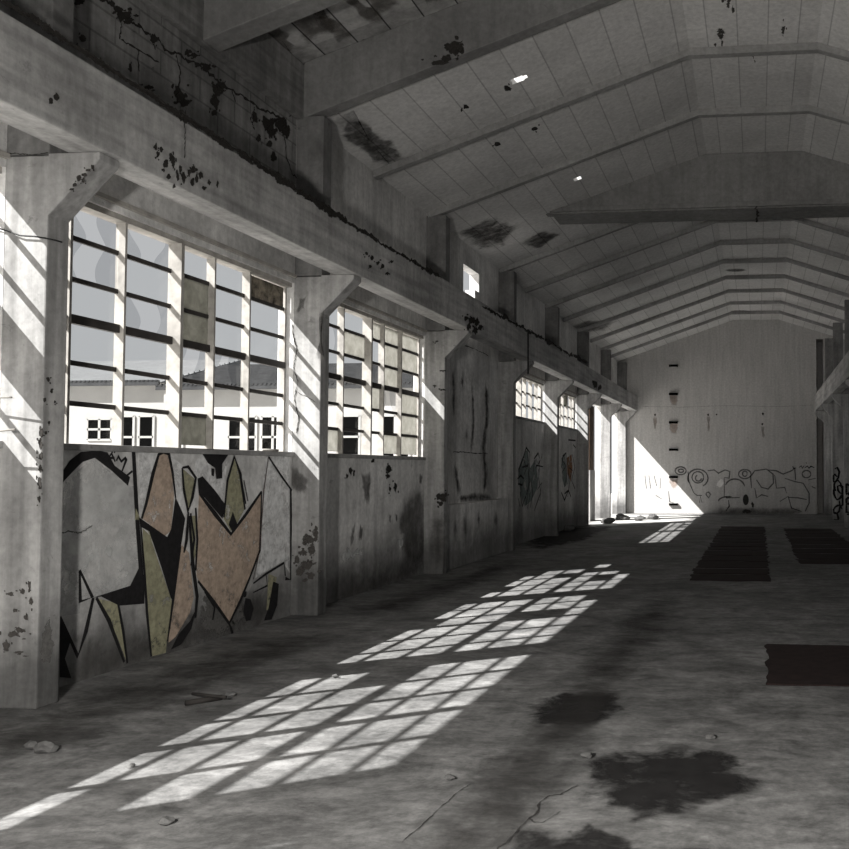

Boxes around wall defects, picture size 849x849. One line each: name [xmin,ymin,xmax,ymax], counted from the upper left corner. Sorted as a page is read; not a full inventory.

water stain [347,0,395,20]
water stain [295,11,350,37]
water stain [267,29,291,50]
spalling [421,36,464,65]
spalling [0,0,441,277]
water stain [344,121,399,163]
water stain [463,221,512,247]
water stain [528,232,557,248]
spalling [292,523,321,582]